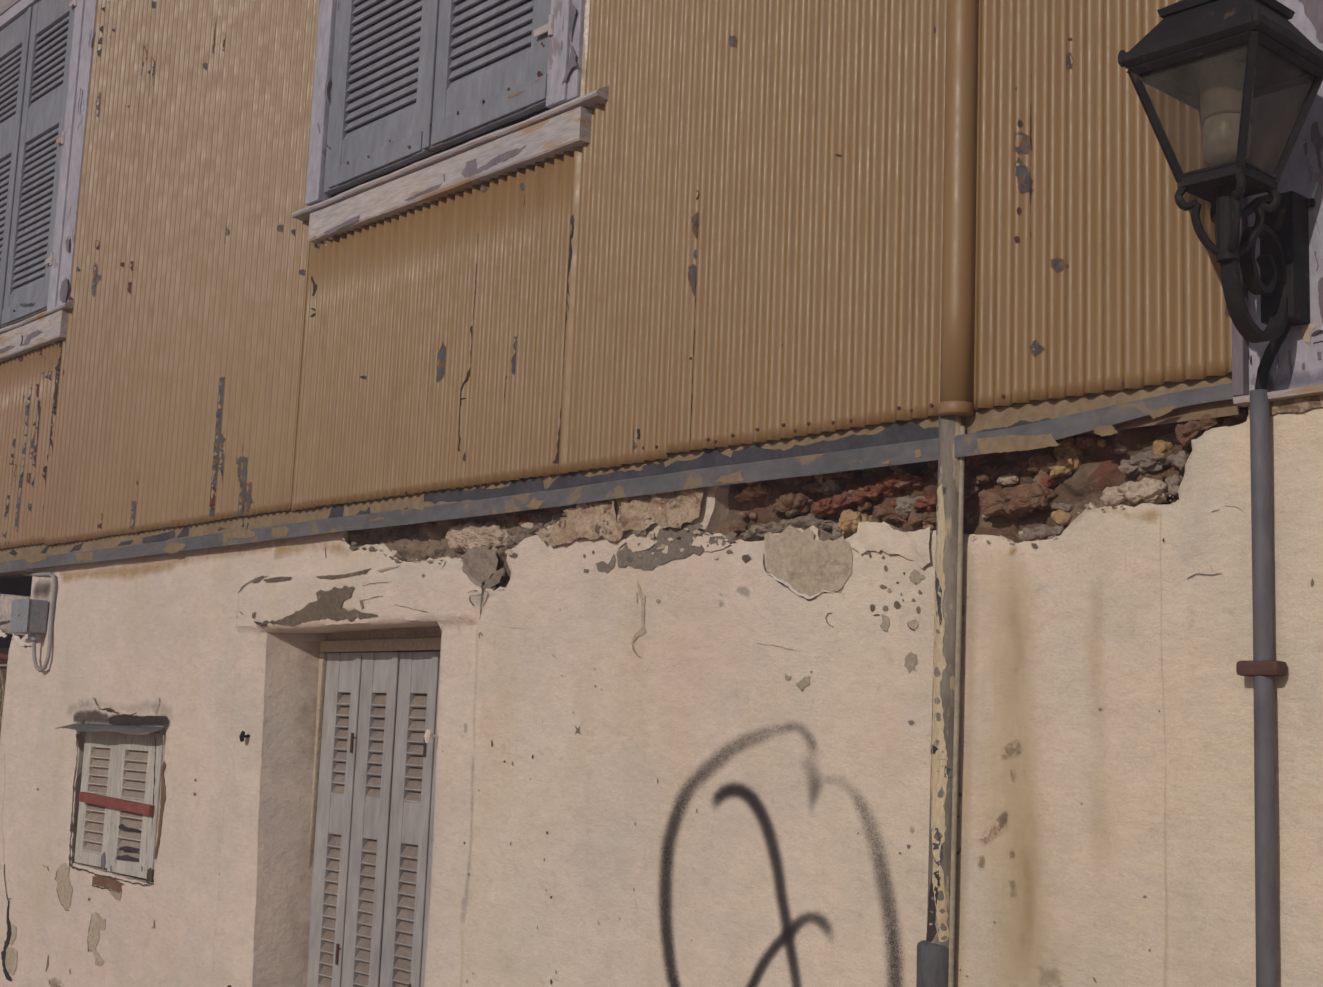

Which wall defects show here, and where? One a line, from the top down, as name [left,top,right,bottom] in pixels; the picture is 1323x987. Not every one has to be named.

peeling [89,1,115,56]
peeling [1299,0,1323,42]
peeling [1014,111,1034,200]
peeling [504,337,517,397]
peeling [0,330,55,564]
peeling [208,377,256,538]
spalling [963,405,1250,548]
peeling [118,501,189,554]
crack [1,864,17,981]
peeling [42,863,72,911]
peeling [87,735,156,966]
leakage [979,813,1007,868]